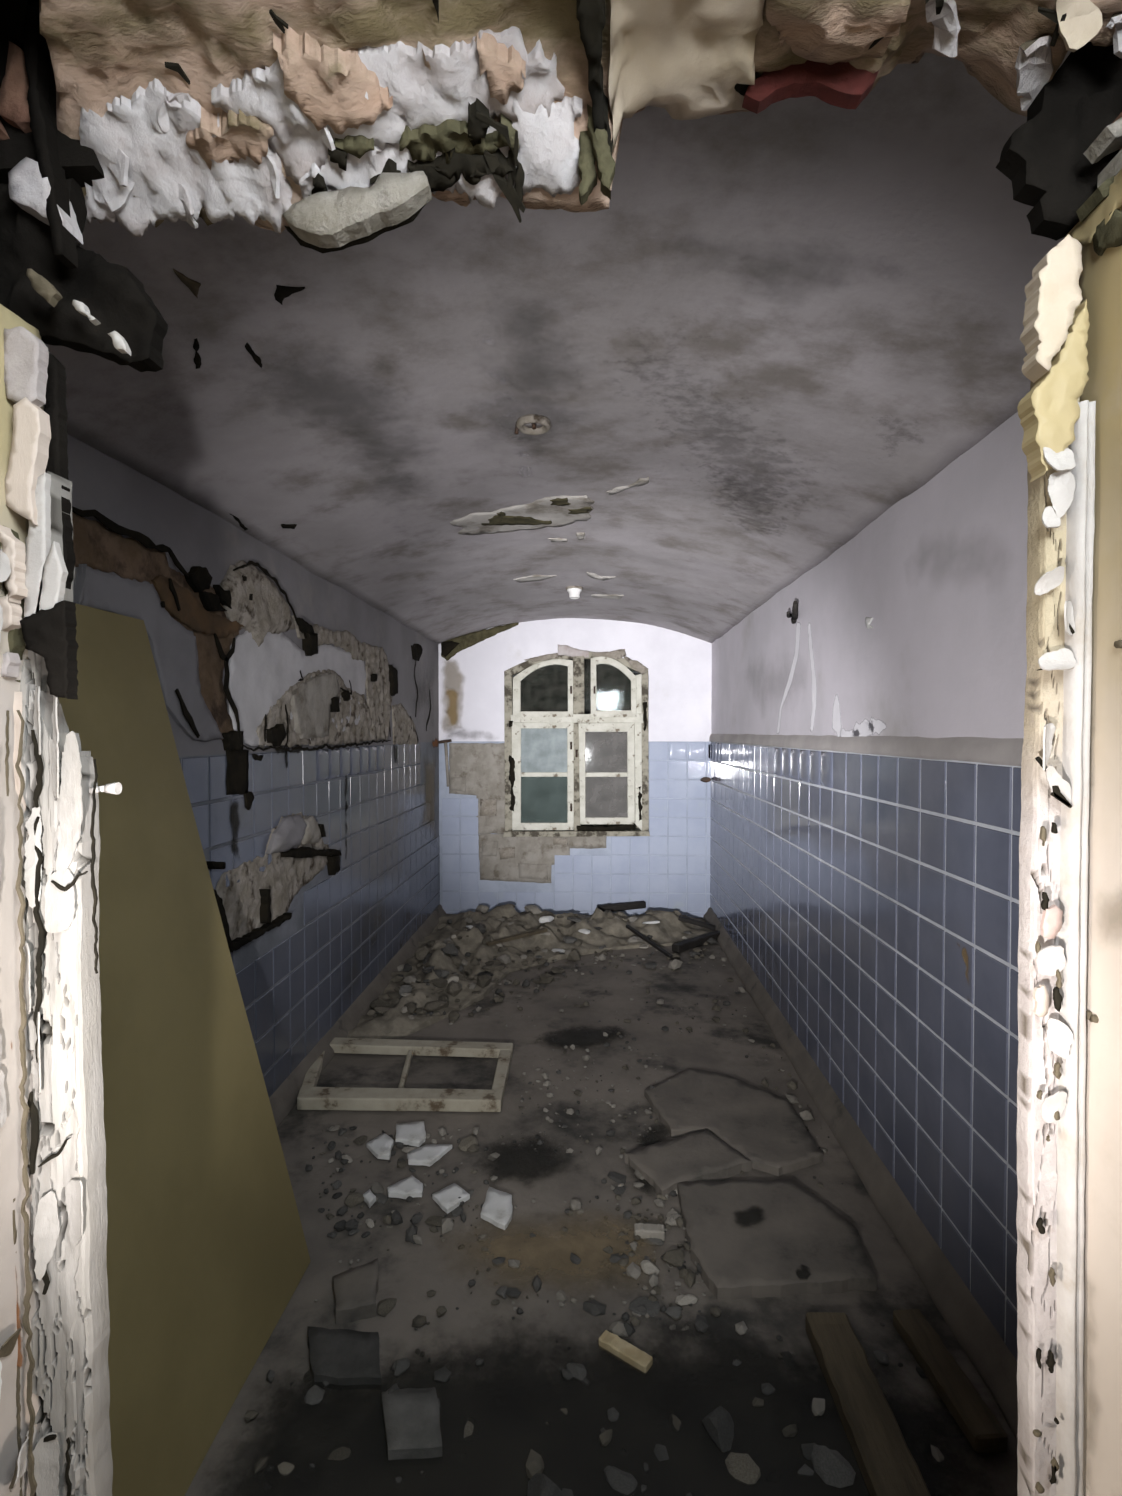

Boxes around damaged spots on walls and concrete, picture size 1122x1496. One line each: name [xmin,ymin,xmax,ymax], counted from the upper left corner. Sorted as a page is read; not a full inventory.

spalling [925,0,961,57]
flaking render [0,0,582,372]
spalling [995,0,1122,256]
peeling [450,477,649,542]
peeling [1042,447,1076,528]
spalling [72,506,398,753]
peeling [1034,566,1076,671]
spalling [206,812,342,952]
peeling [449,743,606,883]
peeling [1043,723,1071,804]
peeling [1033,892,1074,1142]
spalling [1036,1347,1056,1373]